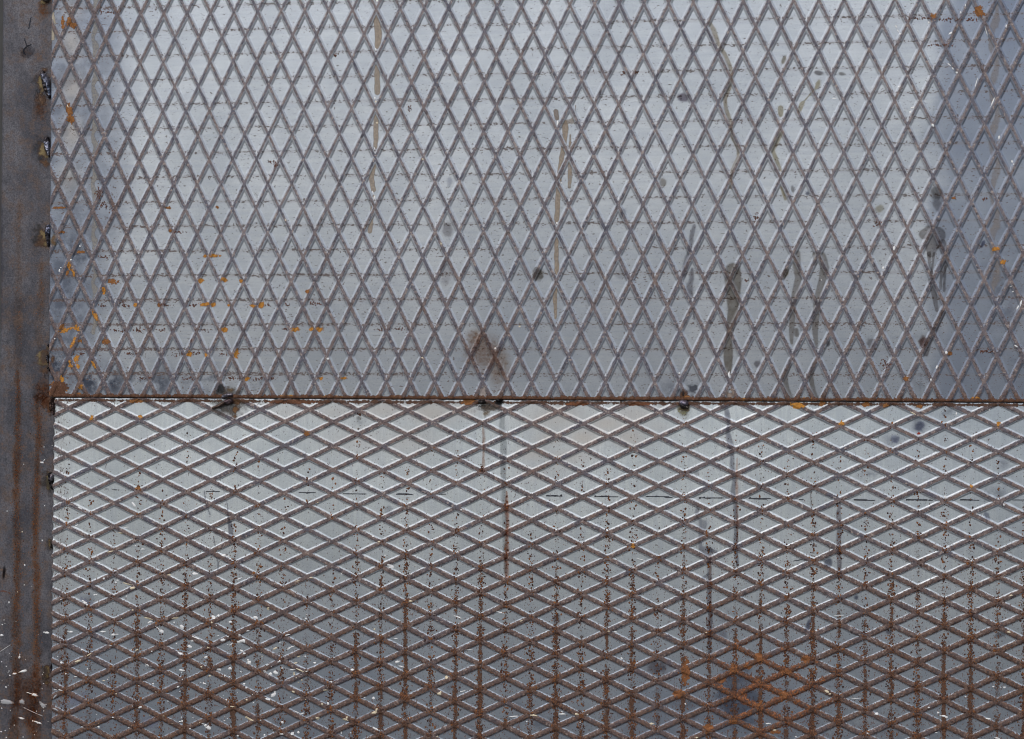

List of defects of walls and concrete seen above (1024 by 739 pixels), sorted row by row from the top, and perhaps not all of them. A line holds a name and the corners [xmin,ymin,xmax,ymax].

rust [92,279,119,321]
rust [7,371,45,739]
rust [49,324,1024,739]